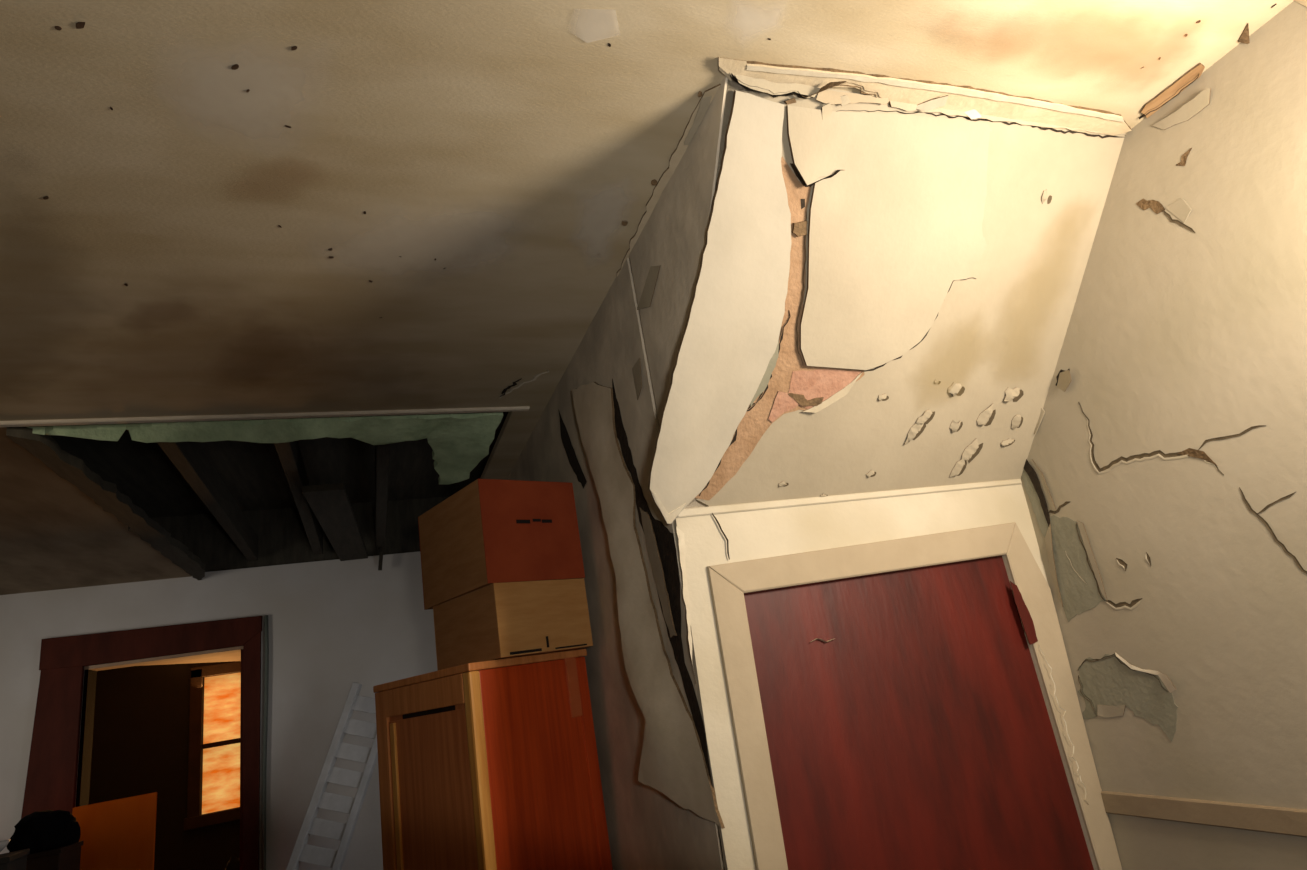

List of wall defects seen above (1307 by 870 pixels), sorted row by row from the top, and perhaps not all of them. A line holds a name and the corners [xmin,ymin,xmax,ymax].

crack [729,72,1120,139]
peeling [637,265,661,310]
flaking render [648,57,1132,524]
spalling [6,427,206,580]
crack [1079,403,1307,574]
spalling [1045,515,1108,622]
crack [1105,552,1151,611]
spalling [1078,652,1178,742]